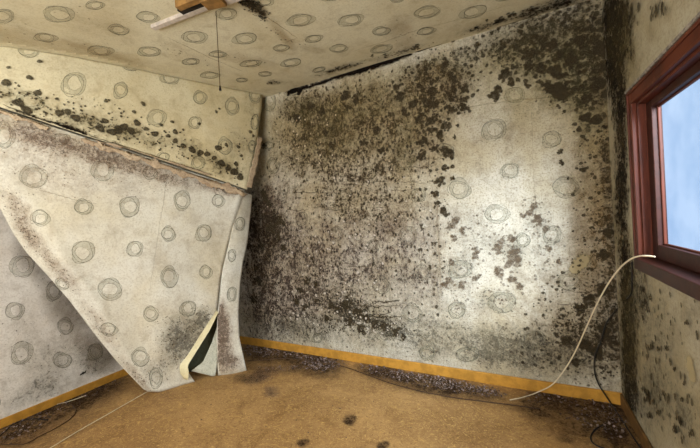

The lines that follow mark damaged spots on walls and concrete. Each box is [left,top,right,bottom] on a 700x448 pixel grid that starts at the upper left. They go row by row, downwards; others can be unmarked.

water stain [0,79,255,194]
water stain [237,0,696,444]
water stain [161,304,240,372]